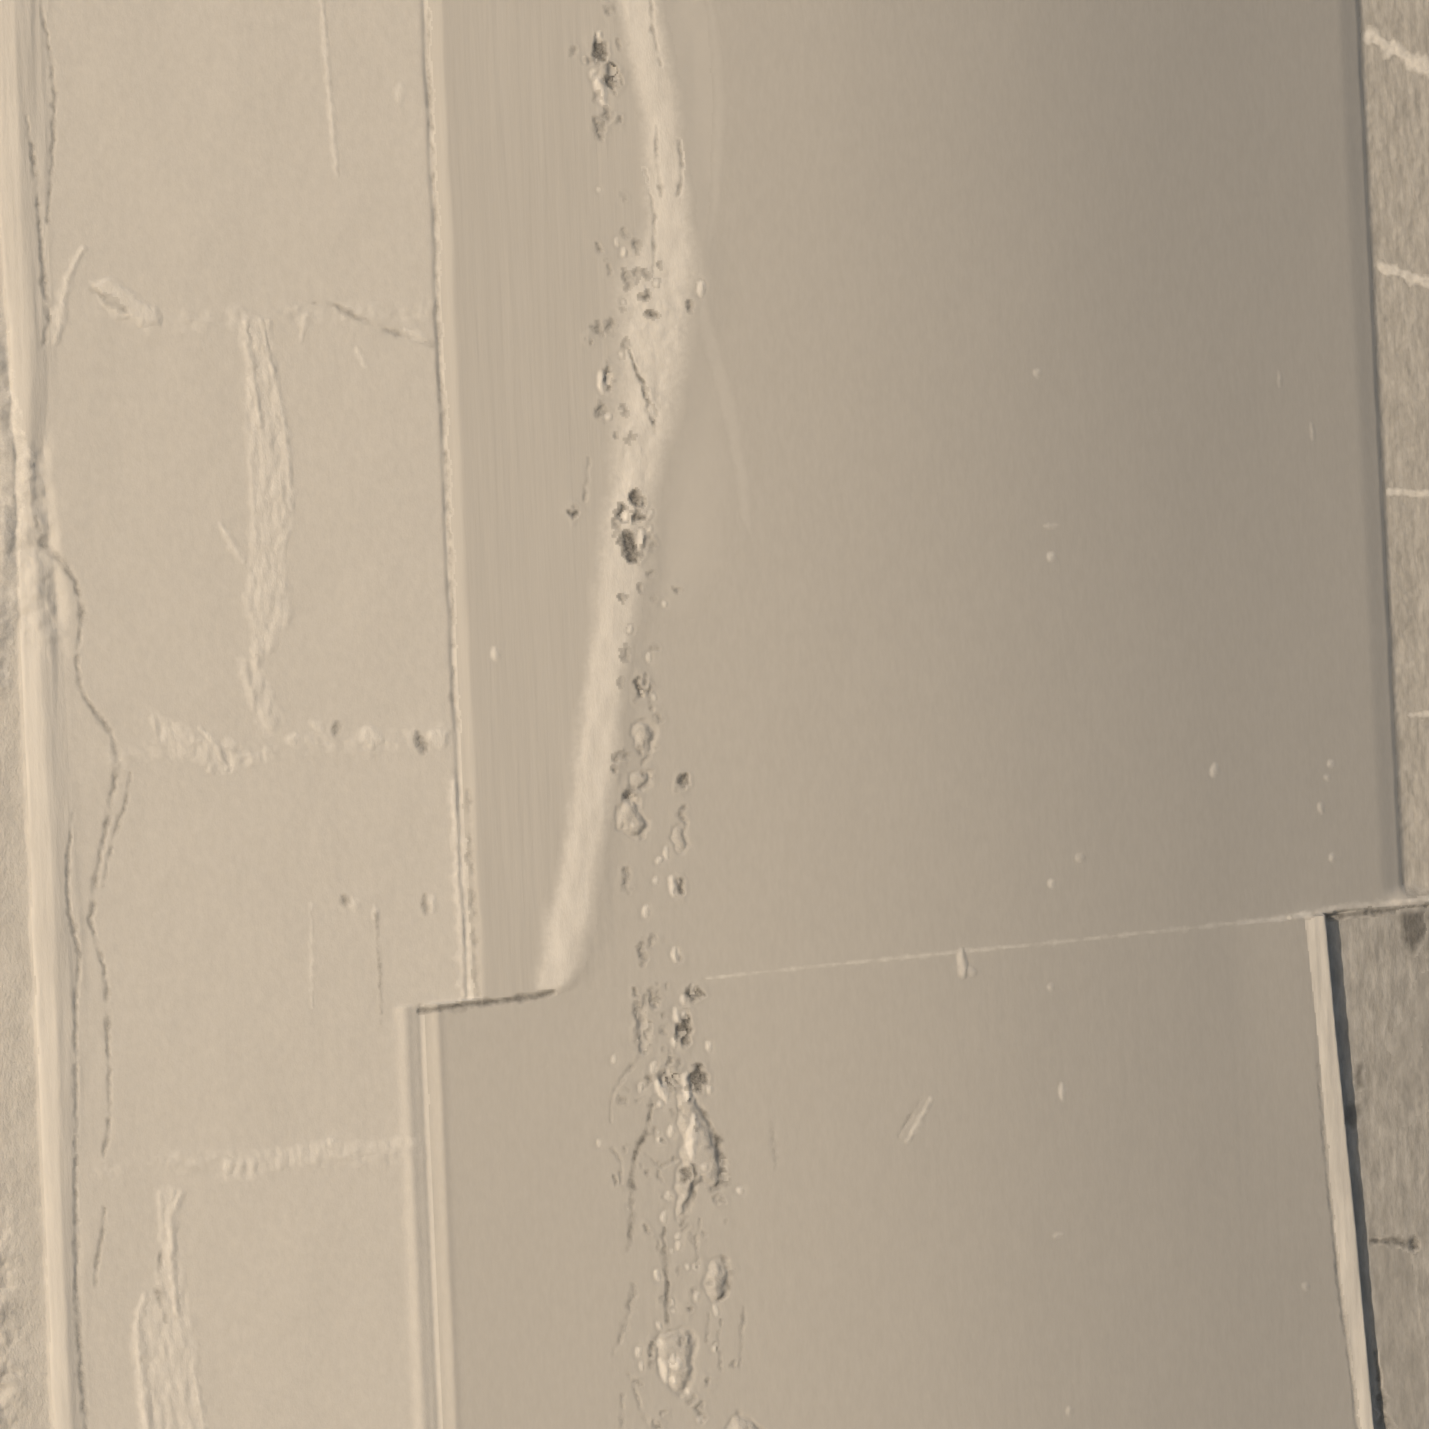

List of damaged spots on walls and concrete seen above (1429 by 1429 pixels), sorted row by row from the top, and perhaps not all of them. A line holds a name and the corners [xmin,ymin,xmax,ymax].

spalling [568,3,624,143]
spalling [584,225,663,446]
spalling [685,278,707,315]
spalling [611,487,685,608]
spalling [610,623,667,841]
spalling [651,772,694,898]
crack [33,514,134,1429]
leakage [1387,905,1429,1127]
spalling [615,864,746,1429]